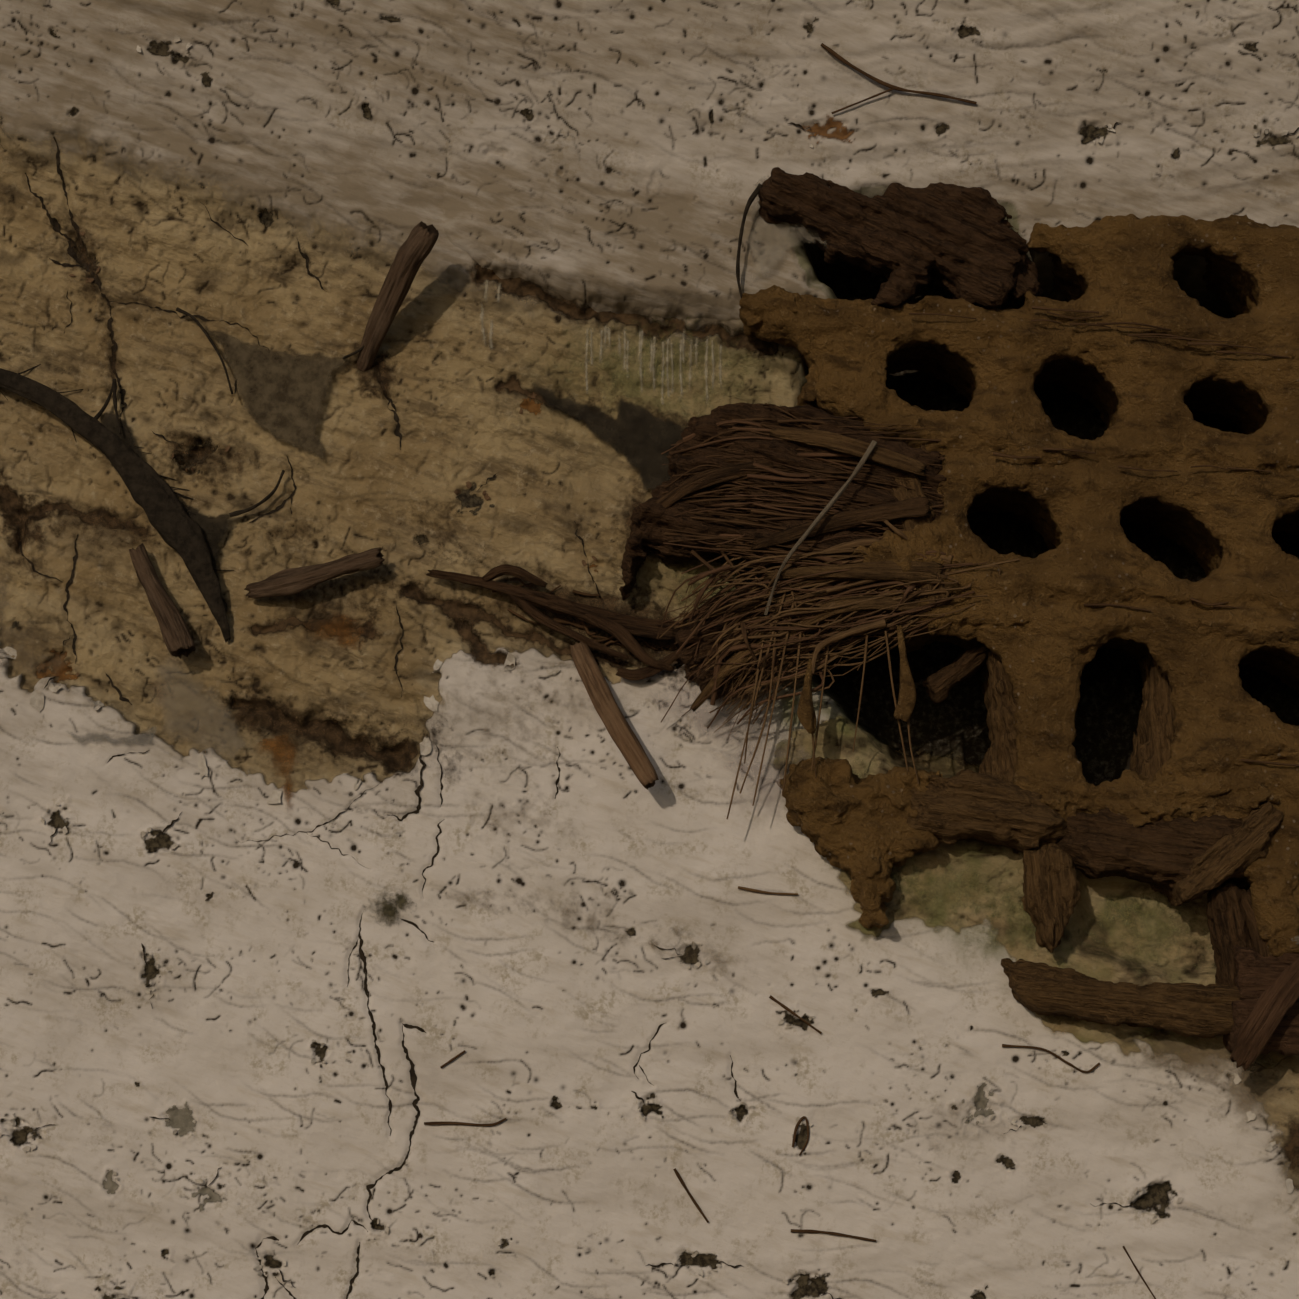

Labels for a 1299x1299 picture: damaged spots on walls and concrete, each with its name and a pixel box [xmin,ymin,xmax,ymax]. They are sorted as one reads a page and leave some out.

crack [25,137,267,419]
crack [297,239,327,292]
peeling [0,127,805,804]
peeling [771,715,979,779]
spalling [40,803,69,844]
spalling [140,811,183,853]
crack [237,734,443,942]
spalling [141,943,161,1009]
spalling [654,941,710,969]
peeling [838,840,1216,986]
crack [255,909,426,1299]
peeling [1033,1012,1299,1194]